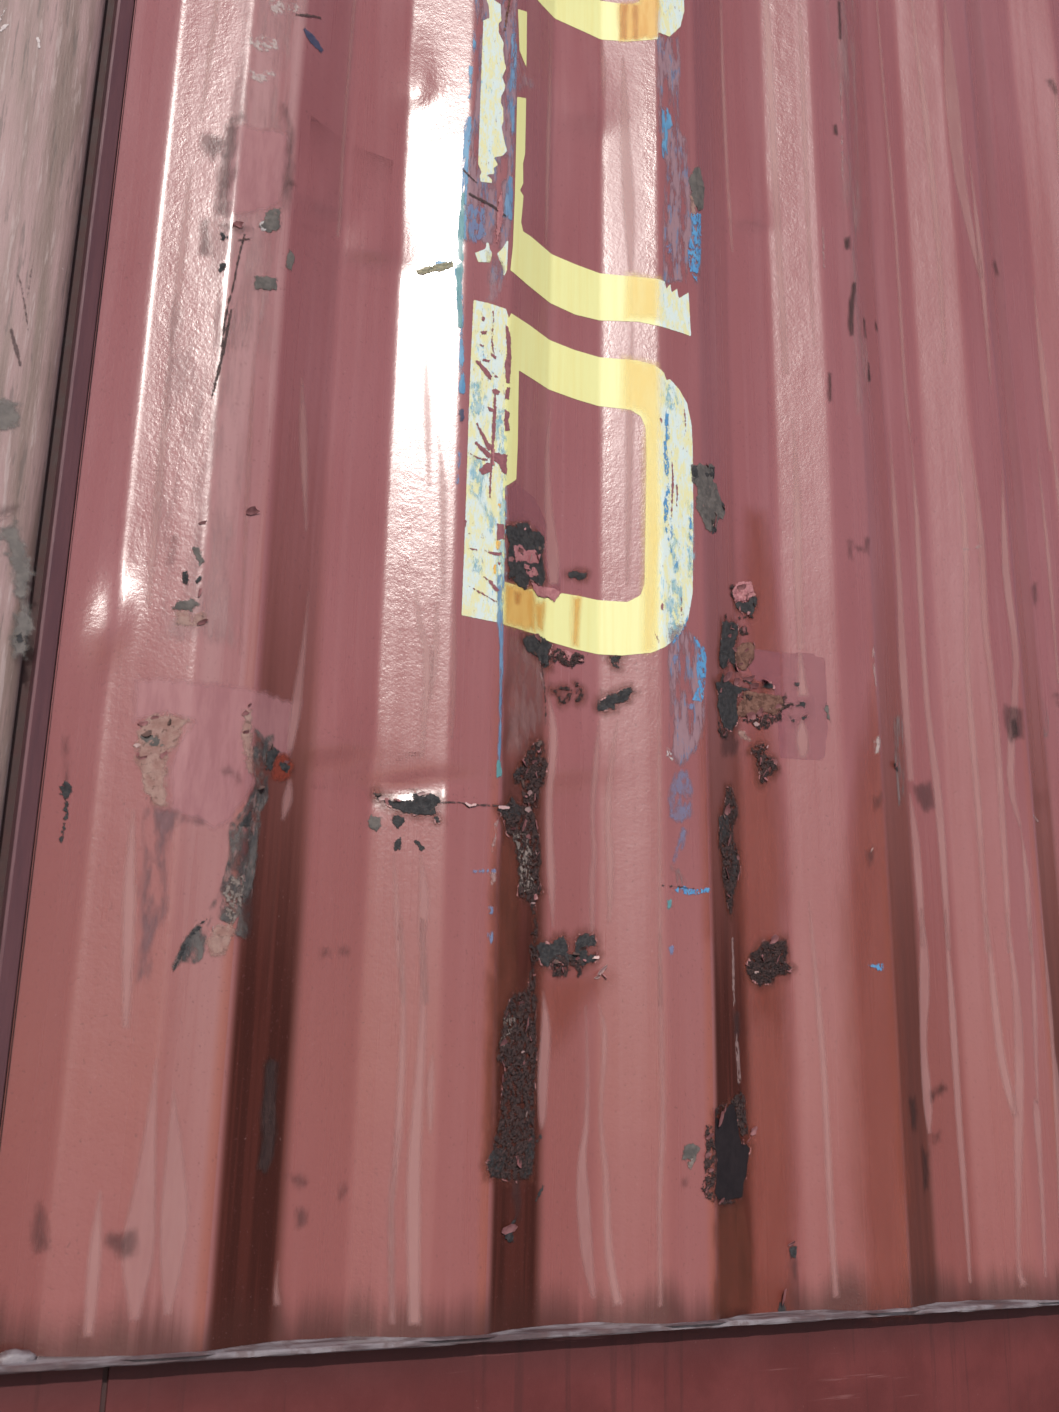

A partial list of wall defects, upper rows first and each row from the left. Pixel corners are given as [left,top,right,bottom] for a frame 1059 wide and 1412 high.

corrosion [620,0,658,40]
corrosion [691,463,725,533]
corrosion [506,522,632,711]
corrosion [719,580,757,671]
peeling [133,714,189,806]
peeling [241,703,265,790]
corrosion [751,744,778,783]
corrosion [718,786,741,914]
corrosion [486,739,607,1202]
corrosion [745,934,792,987]
corrosion [682,1091,758,1312]